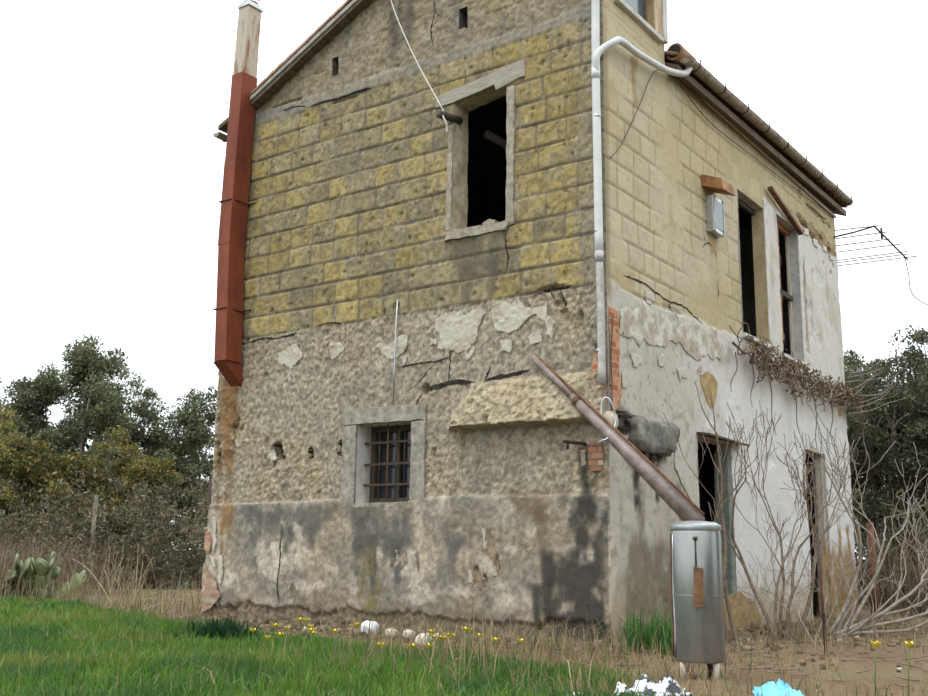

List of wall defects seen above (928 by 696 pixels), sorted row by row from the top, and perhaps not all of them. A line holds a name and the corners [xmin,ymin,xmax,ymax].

peeling [430,297,557,360]
crack [624,275,702,323]
spalling [267,444,285,462]
spalling [200,517,223,614]
spalling [389,547,420,573]
spalling [468,528,500,590]